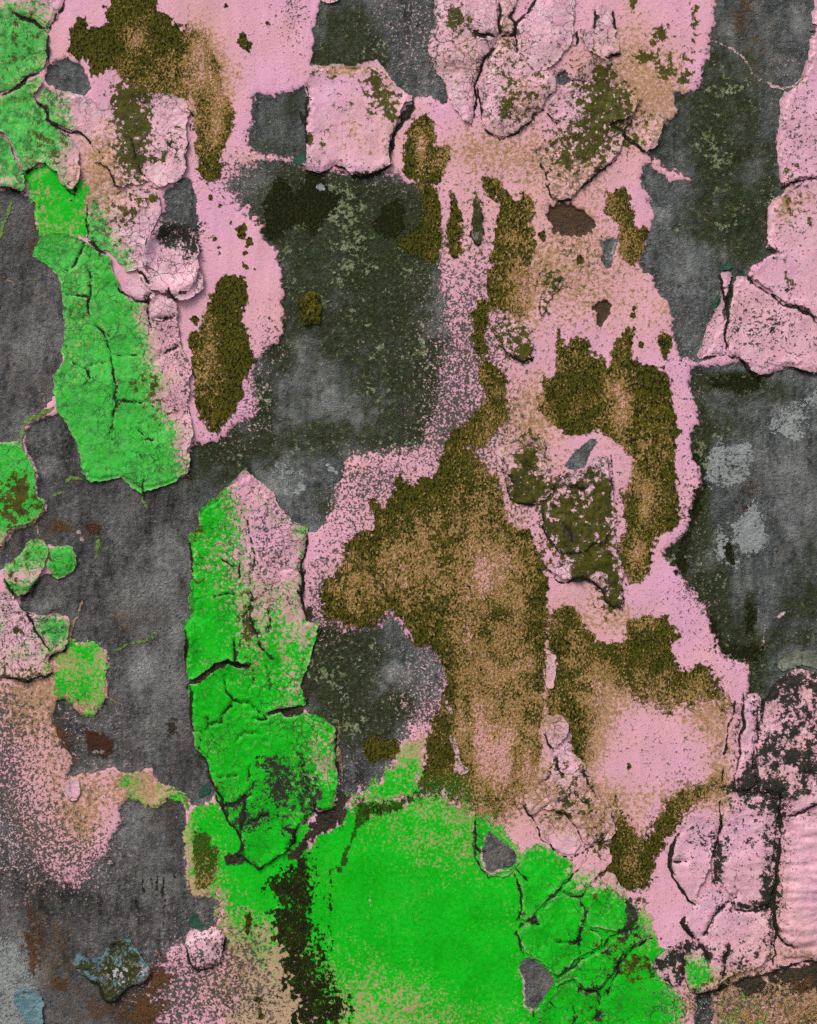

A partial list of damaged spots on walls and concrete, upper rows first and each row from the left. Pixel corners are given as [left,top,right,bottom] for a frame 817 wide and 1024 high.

crack [66,184,152,493]
crack [117,271,177,327]
peeling [0,0,641,868]
crack [471,0,587,140]
crack [539,117,646,203]
crack [575,10,621,59]
peeling [626,0,817,961]
crack [702,274,817,378]
crack [184,520,339,870]
peeling [0,795,225,1024]
crack [514,733,653,1024]
crack [650,694,817,996]